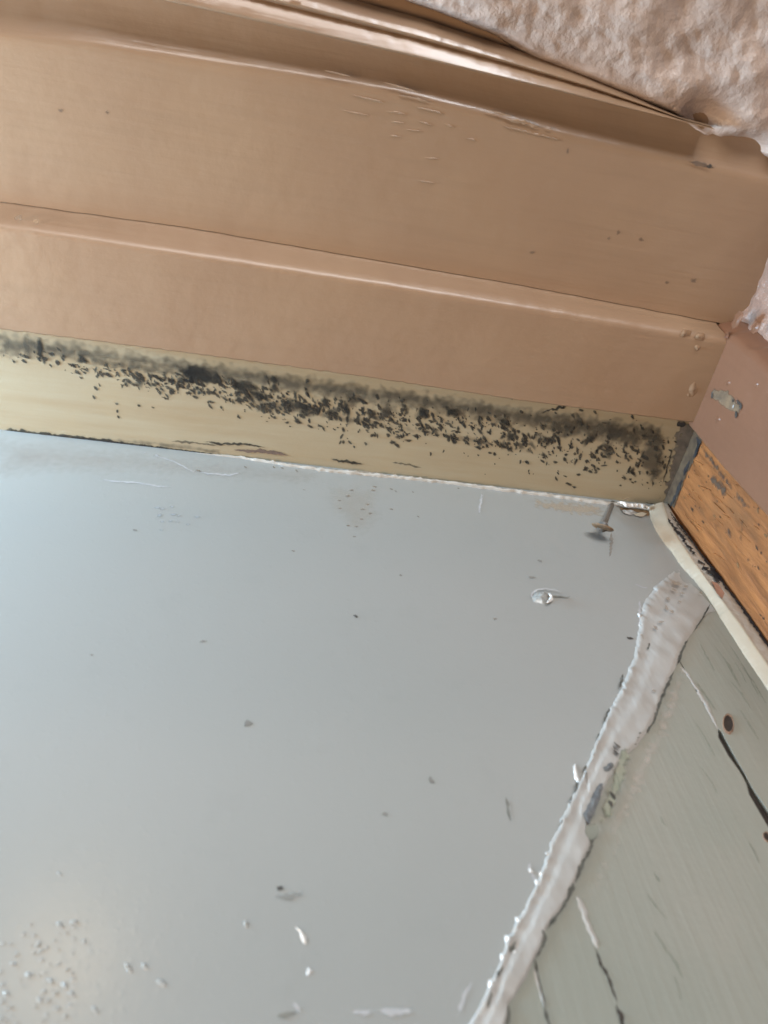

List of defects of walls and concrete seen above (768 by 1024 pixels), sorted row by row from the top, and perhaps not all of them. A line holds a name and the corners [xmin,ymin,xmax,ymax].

peeling [711,389,742,418]
damp [3,340,767,570]
crack [718,734,768,826]
crack [596,948,624,1024]